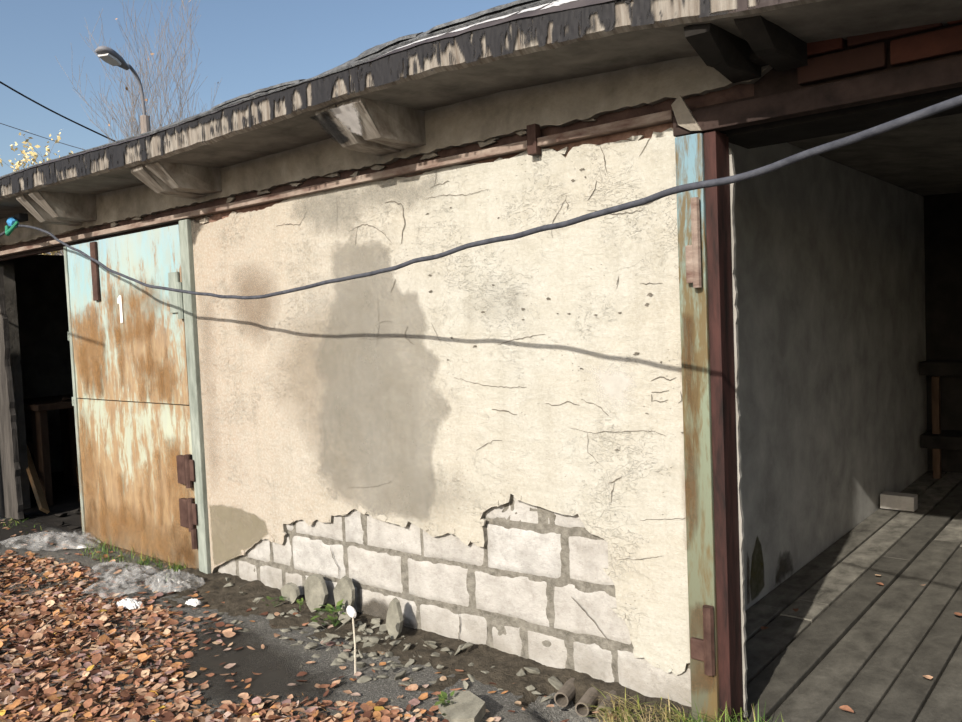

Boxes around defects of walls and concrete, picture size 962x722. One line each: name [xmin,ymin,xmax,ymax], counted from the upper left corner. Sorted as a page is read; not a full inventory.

peeling [383,0,576,55]
flaking render [541,84,754,156]
flaking render [0,131,527,251]
crack [336,191,406,244]
corrosion [115,287,154,380]
damp [321,246,438,516]
crack [460,378,525,415]
crack [546,399,665,459]
crack [651,376,682,403]
corrosion [684,319,692,384]
corrosion [685,450,697,524]
flaking render [217,494,691,707]